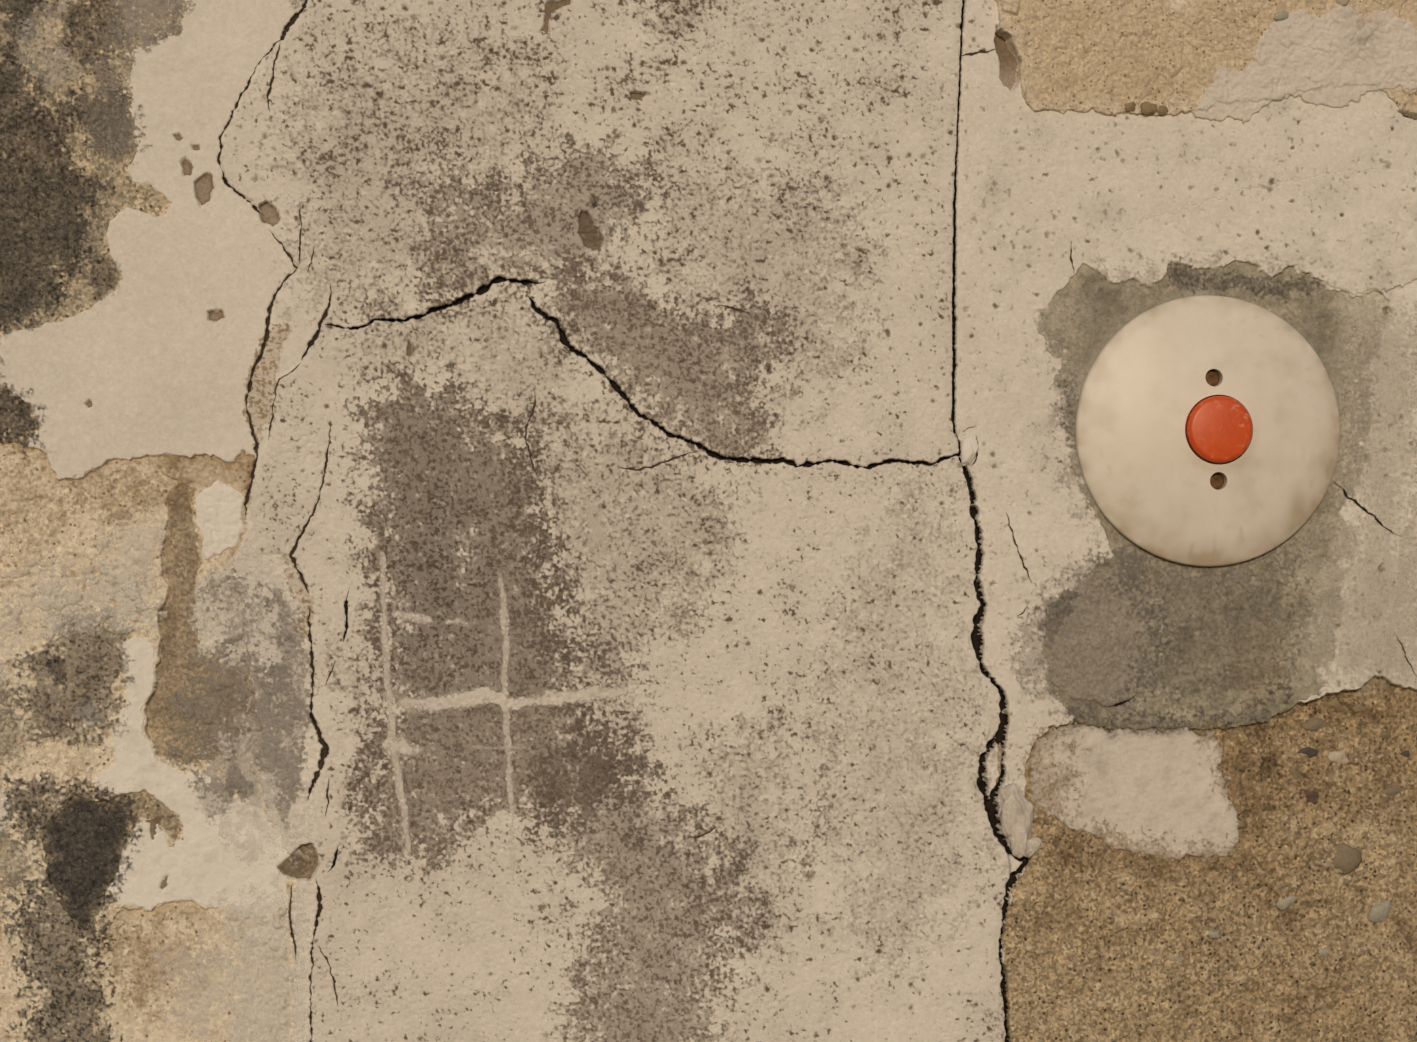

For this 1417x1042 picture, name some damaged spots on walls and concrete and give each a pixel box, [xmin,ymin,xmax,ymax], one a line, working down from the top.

damp [0,383,44,453]
peeling [0,0,188,338]
damp [0,0,193,334]
peeling [173,134,214,205]
peeling [209,311,225,322]
peeling [259,202,280,226]
crack [217,0,1032,1042]
flaking render [994,0,1417,124]
peeling [0,385,318,1042]
spalling [1000,513,1417,1042]